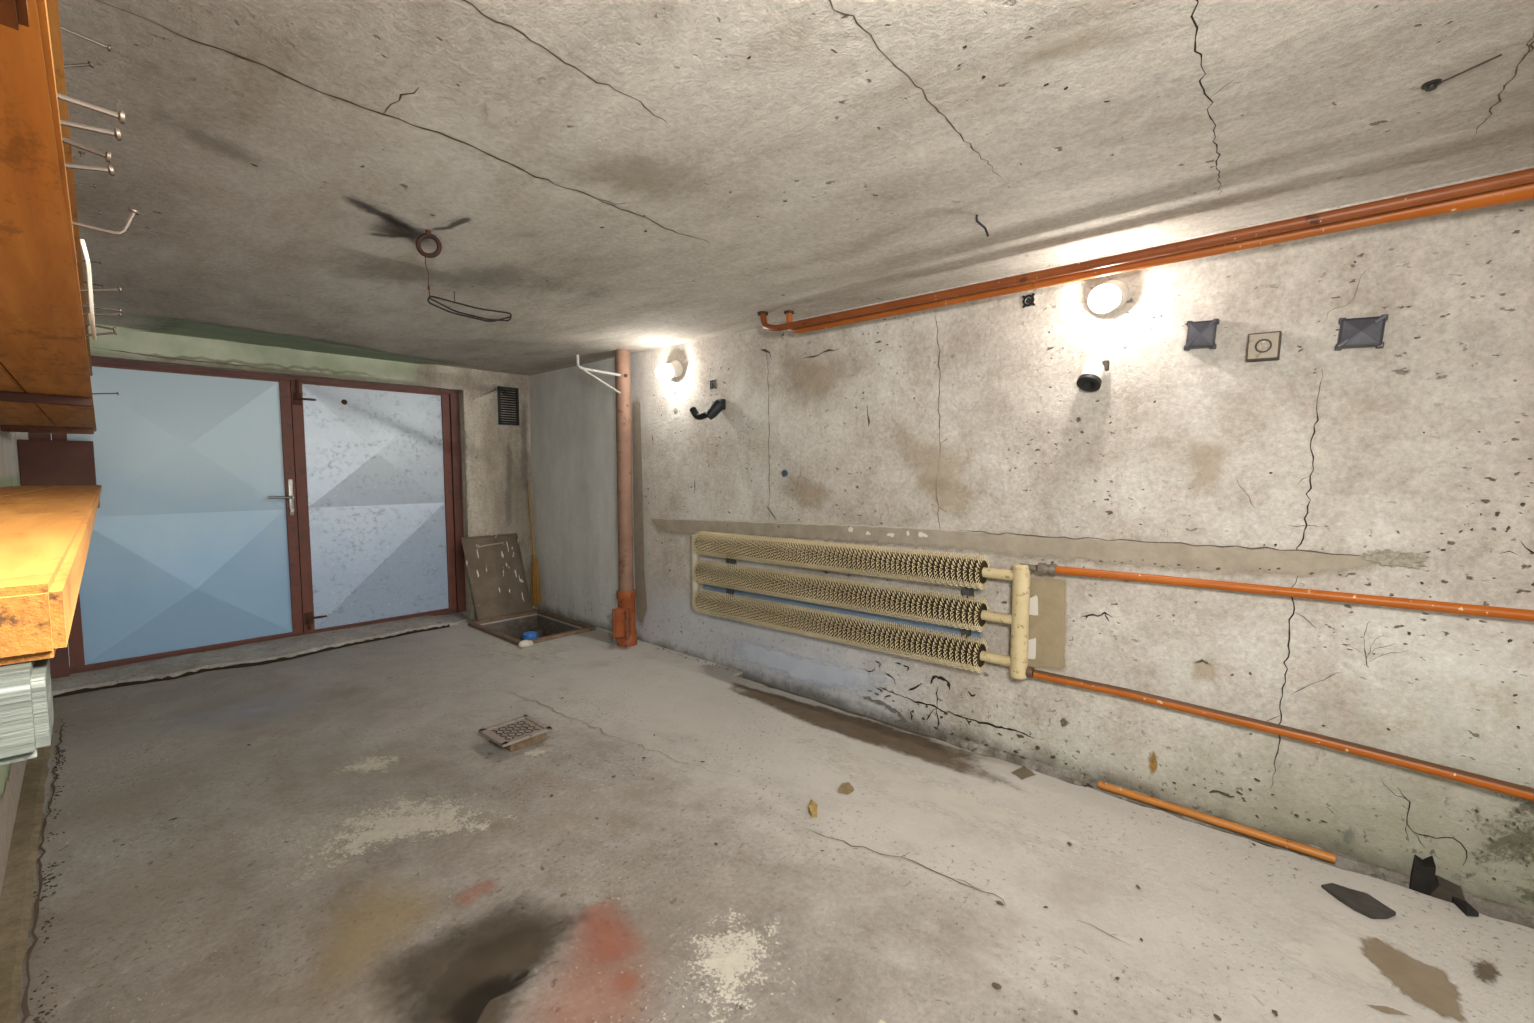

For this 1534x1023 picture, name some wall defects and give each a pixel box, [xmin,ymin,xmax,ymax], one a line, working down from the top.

crack [829,0,999,175]
crack [1190,0,1236,191]
crack [1472,34,1534,139]
crack [1268,372,1408,787]
peeling [0,760,27,896]
crack [1382,781,1467,865]
water stain [1474,798,1534,864]